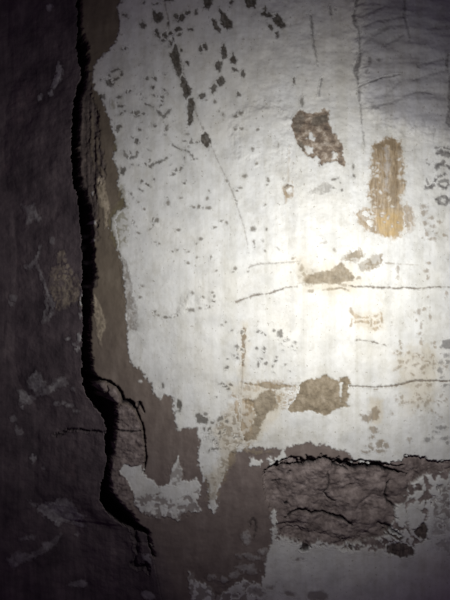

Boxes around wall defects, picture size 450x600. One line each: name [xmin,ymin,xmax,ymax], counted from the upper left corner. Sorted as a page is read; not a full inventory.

peeling [74,0,132,242]
peeling [115,71,173,129]
peeling [168,130,212,177]
peeling [289,95,357,180]
peeling [306,176,344,197]
rust [353,134,419,246]
crack [51,0,154,576]
crack [234,285,299,304]
crack [347,283,450,291]
peeling [80,203,450,600]
crack [348,378,450,389]
crack [263,454,407,528]